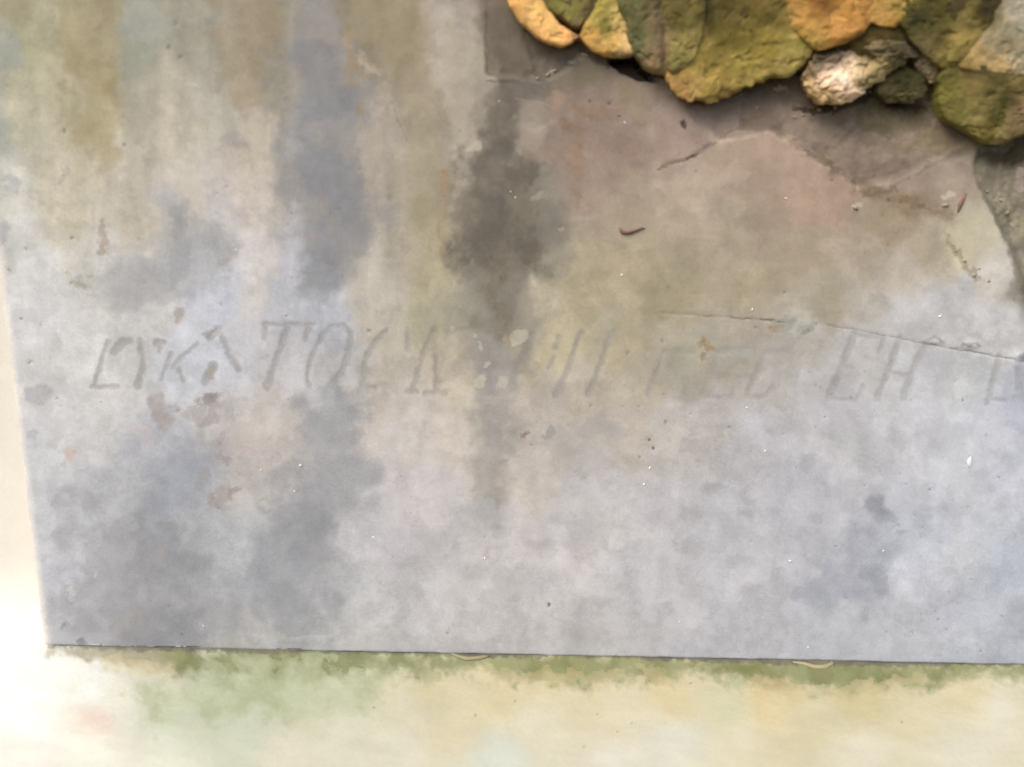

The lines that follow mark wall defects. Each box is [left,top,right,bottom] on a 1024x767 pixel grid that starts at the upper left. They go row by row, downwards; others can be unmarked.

damp [91,0,180,47]
damp [65,52,131,175]
crack [656,141,718,171]
damp [70,177,247,318]
damp [280,0,634,574]
crack [662,312,785,323]
crack [827,323,1016,359]
damp [22,381,56,408]